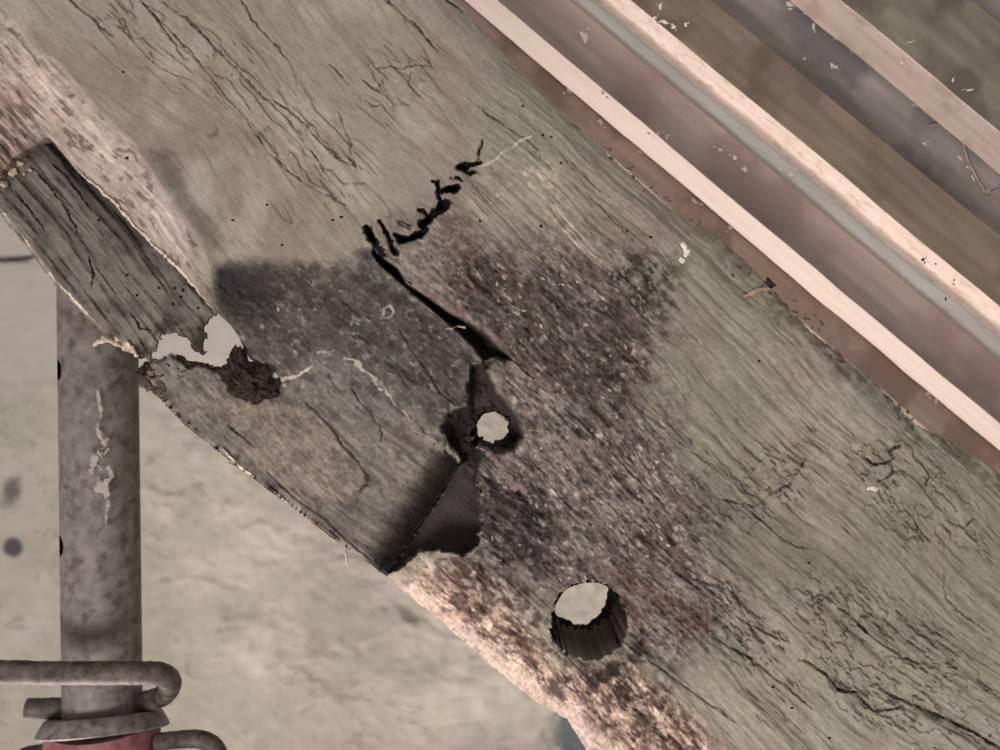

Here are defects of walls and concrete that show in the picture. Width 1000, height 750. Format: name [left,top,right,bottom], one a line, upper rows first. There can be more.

crack [143,1,352,178]
crack [0,255,33,263]
crack [29,161,95,289]
crack [362,140,534,380]
peeling [272,365,313,387]
damp [220,264,499,462]
peeling [344,357,393,401]
damp [449,271,636,414]
peeling [402,410,461,464]
peeling [476,445,531,497]
damp [474,472,553,567]
crack [809,662,997,745]